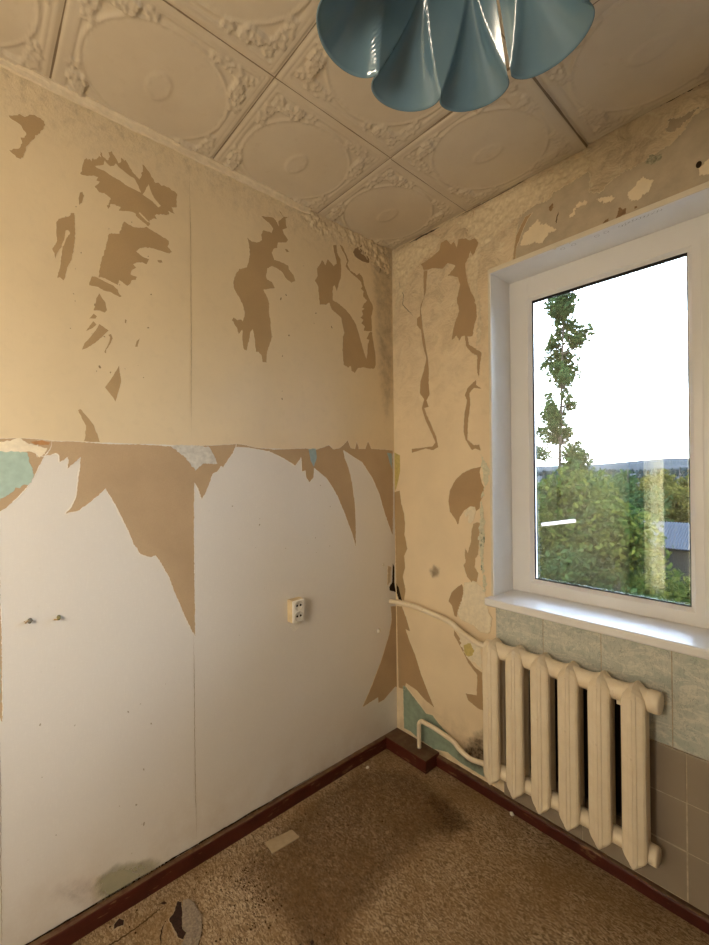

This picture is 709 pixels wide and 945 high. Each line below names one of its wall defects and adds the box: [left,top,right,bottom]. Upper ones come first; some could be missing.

peeling [9,114,45,159]
peeling [52,192,84,280]
peeling [96,365,121,402]
peeling [80,151,177,353]
peeling [232,212,295,362]
peeling [315,245,376,373]
flaking render [392,107,709,617]
peeling [0,409,434,707]
peeling [454,631,483,710]
leakage [101,866,143,895]